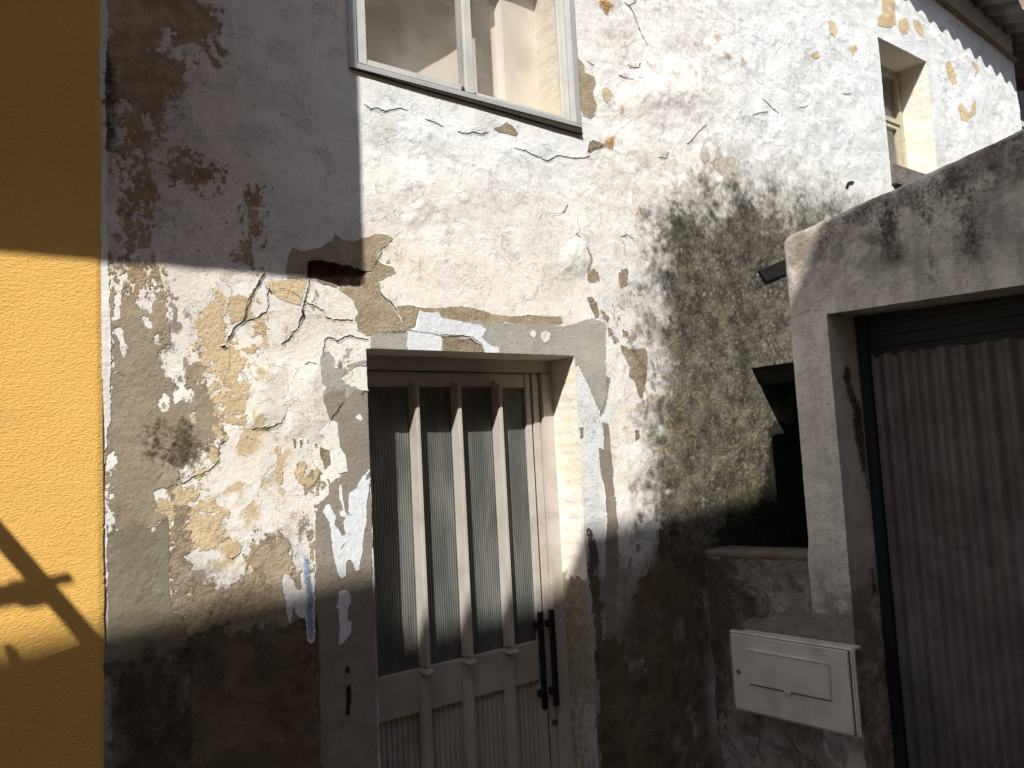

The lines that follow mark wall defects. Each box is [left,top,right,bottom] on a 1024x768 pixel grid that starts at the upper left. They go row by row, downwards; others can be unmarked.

peeling [877,0,924,36]
crack [364,103,488,135]
peeling [577,57,612,119]
crack [514,145,603,161]
peeling [585,247,600,283]
peeling [617,268,629,287]
water stain [872,211,899,262]
peeling [99,0,562,644]
crack [222,245,481,430]
peeling [587,297,648,398]
water stain [635,177,840,768]
water stain [104,620,322,768]